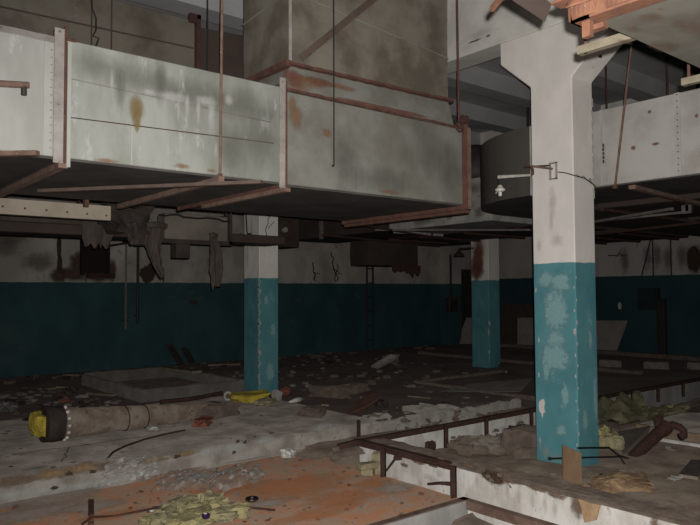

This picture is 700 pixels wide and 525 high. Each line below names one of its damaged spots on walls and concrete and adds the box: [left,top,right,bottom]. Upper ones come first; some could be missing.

rust [286,71,347,89]
crack [312,252,340,282]
rust [472,242,482,278]
peeling [535,272,579,380]